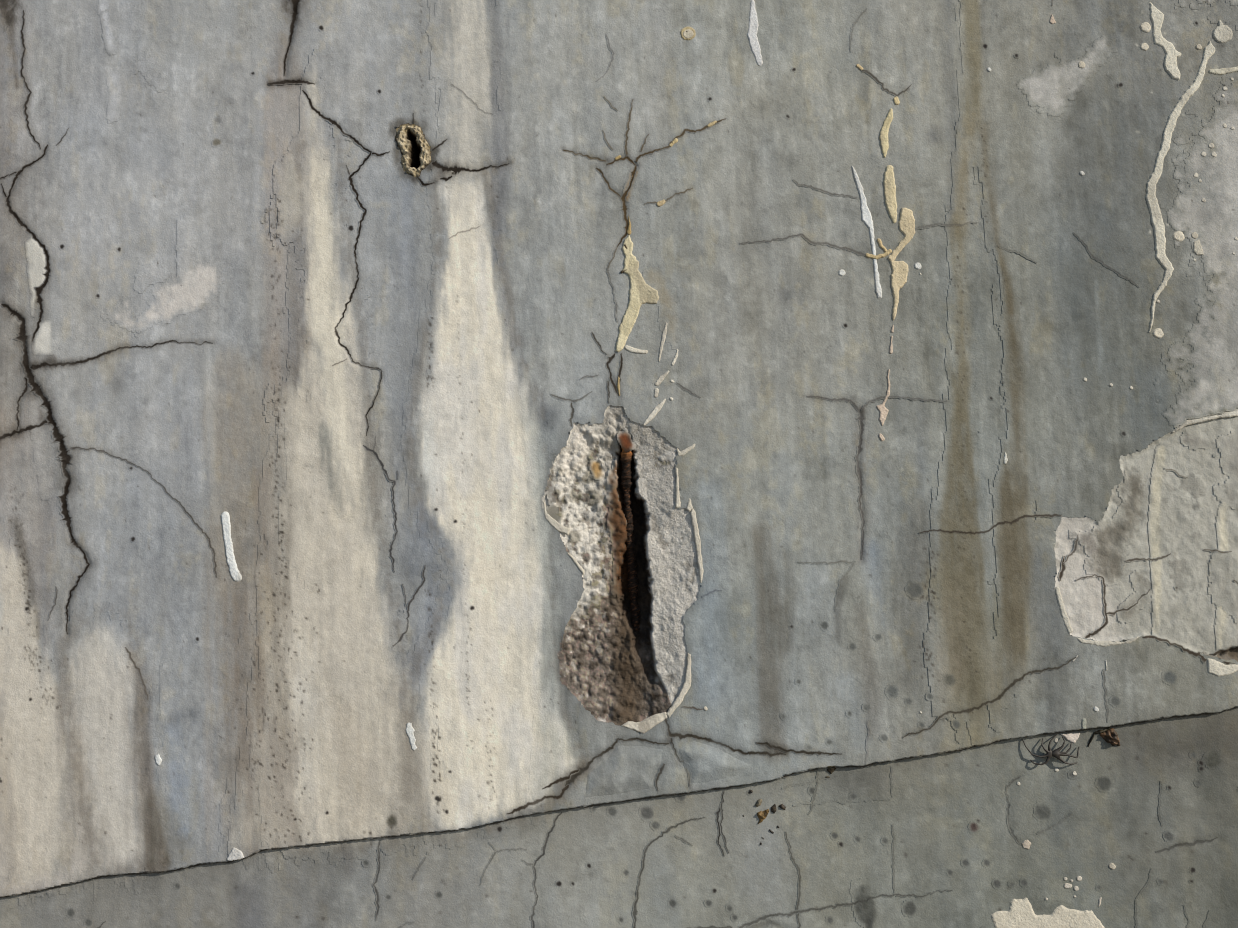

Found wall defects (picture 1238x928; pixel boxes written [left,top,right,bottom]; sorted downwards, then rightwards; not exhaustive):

water stain [0,518,181,928]
crack [0,10,217,634]
crack [267,0,426,646]
water stain [219,0,593,873]
crack [416,139,509,187]
corrosion [588,431,638,598]
crack [0,657,1238,928]
spalling [543,405,704,734]
crack [551,33,726,426]
peeling [991,897,1105,928]
peeling [1017,35,1117,117]
spalling [1054,76,1238,676]